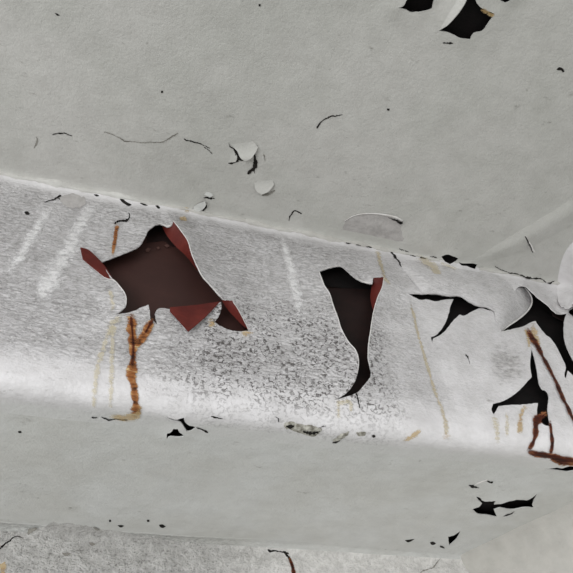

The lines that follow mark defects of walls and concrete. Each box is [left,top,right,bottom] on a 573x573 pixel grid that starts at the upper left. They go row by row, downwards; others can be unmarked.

peeling [400,0,433,12]
peeling [440,0,494,39]
crack [104,132,212,154]
peeling [80,221,249,332]
crack [495,266,554,284]
corrosion [113,314,154,421]
peeling [319,266,384,408]
peeling [413,295,479,340]
peeling [492,351,549,426]
peeling [523,302,573,378]
corrosion [525,328,573,420]
corrosion [528,412,573,466]